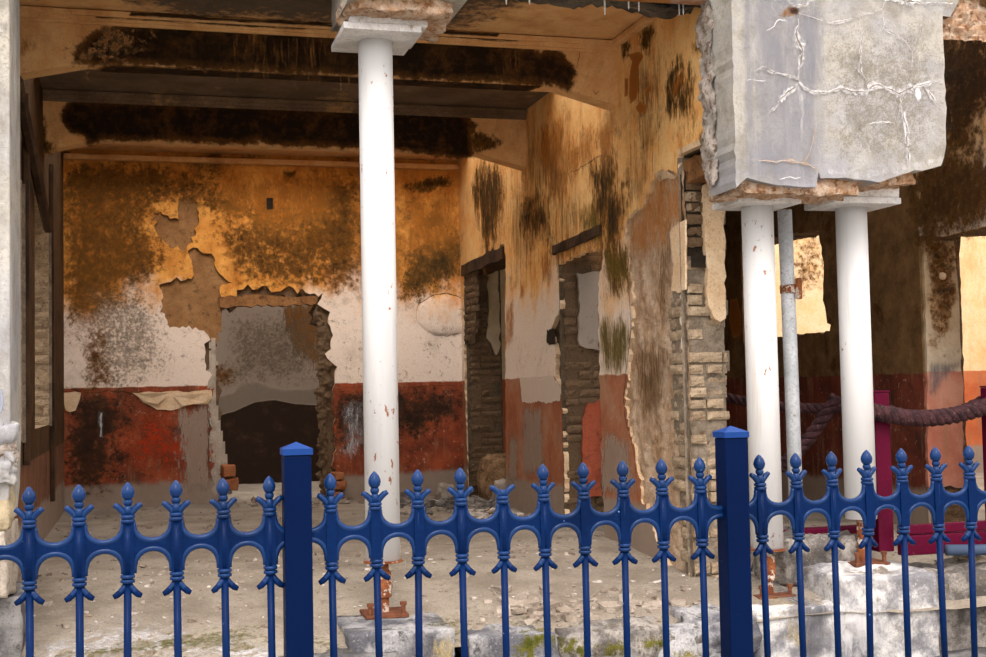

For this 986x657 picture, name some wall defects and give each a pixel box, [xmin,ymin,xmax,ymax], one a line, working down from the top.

spalling [943,0,986,42]
crack [749,0,953,165]
crack [754,129,820,179]
leakage [472,160,505,252]
leakage [519,120,678,322]
leakage [63,162,364,495]
flaking render [133,196,333,495]
leakage [398,387,462,437]
leakage [636,338,663,416]
flaking render [601,169,707,508]
flaking render [668,521,696,578]